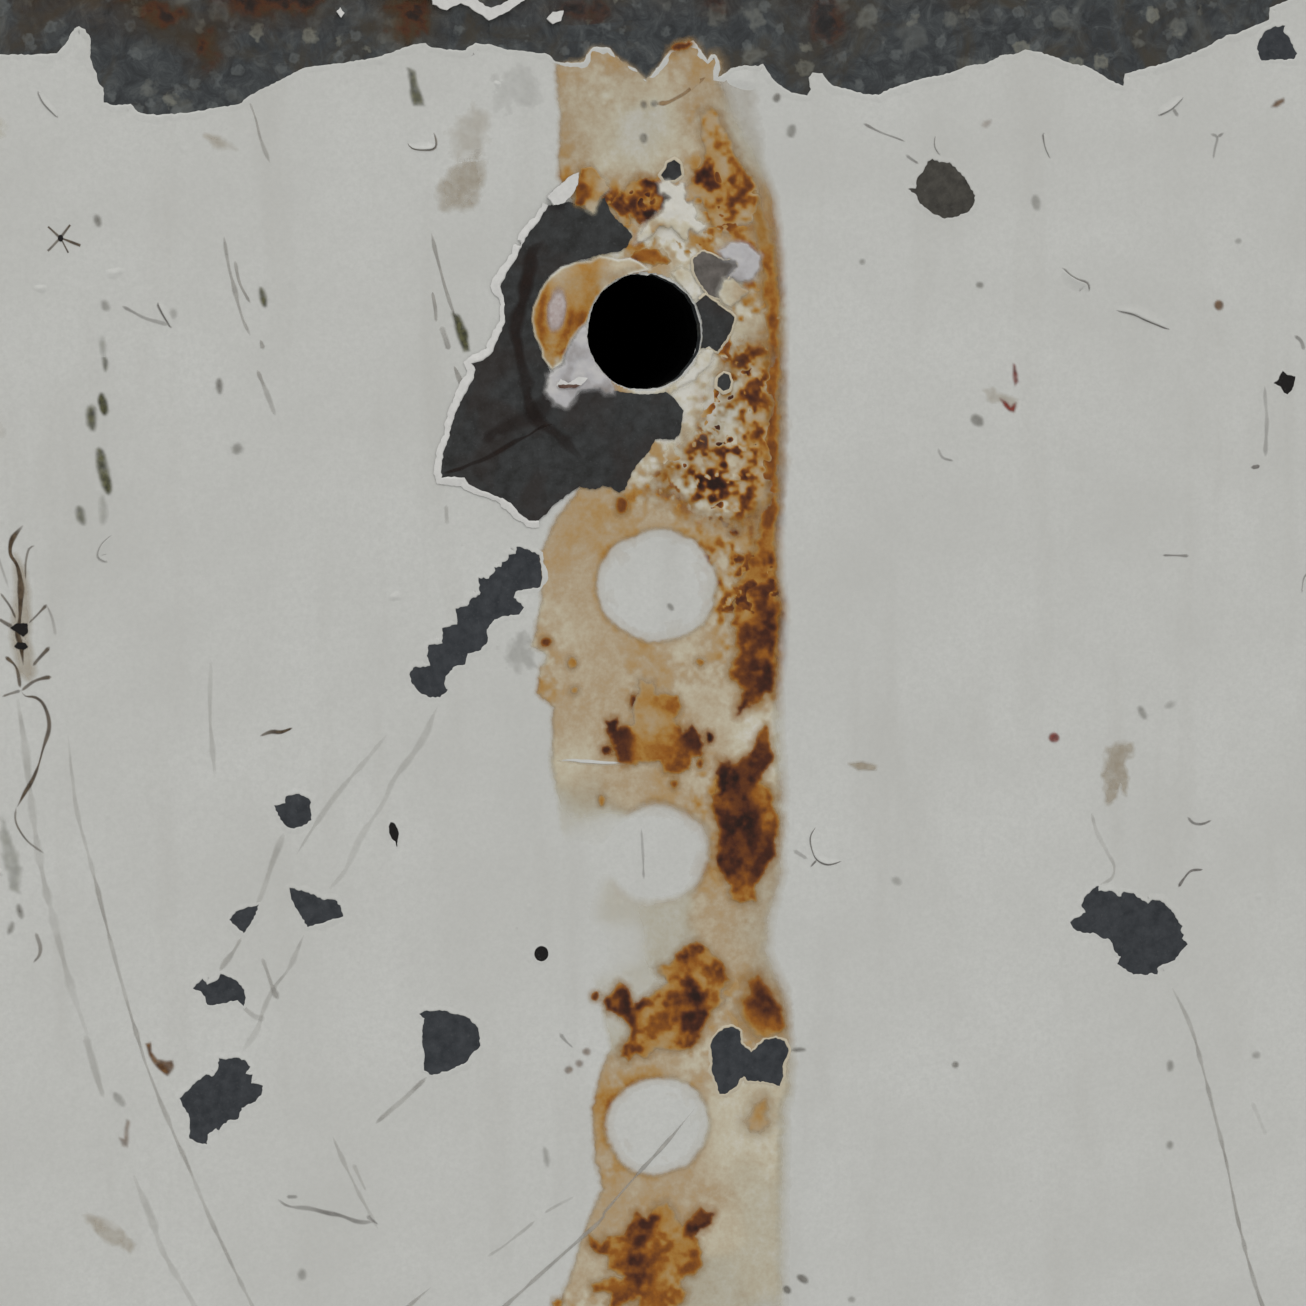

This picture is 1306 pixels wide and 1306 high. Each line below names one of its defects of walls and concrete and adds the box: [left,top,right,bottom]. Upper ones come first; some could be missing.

peeling [0,0,1301,125]
peeling [905,153,981,223]
peeling [433,156,760,528]
peeling [404,543,548,701]
crack [0,530,51,837]
rust [532,40,790,1306]
peeling [283,883,347,931]
peeling [1066,883,1190,981]
peeling [189,970,250,1011]
peeling [173,1052,269,1149]
peeling [414,1006,484,1080]
peeling [707,1024,791,1098]